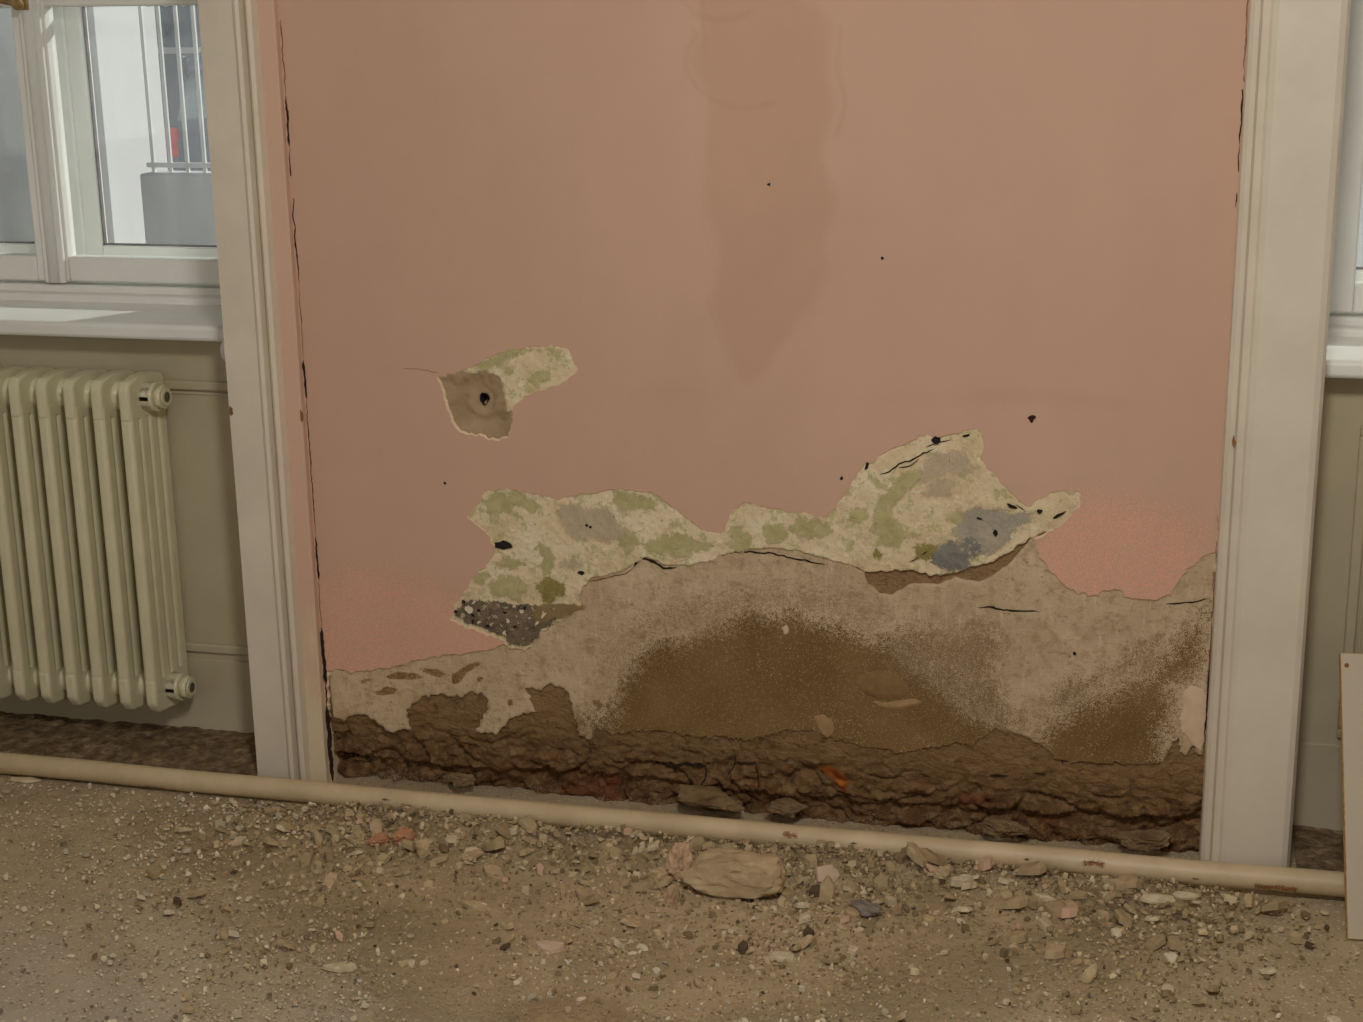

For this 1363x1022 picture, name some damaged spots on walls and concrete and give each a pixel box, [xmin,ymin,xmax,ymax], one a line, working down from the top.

peeling [439,345,577,439]
flaking render [329,428,1216,863]
water stain [565,572,1212,765]